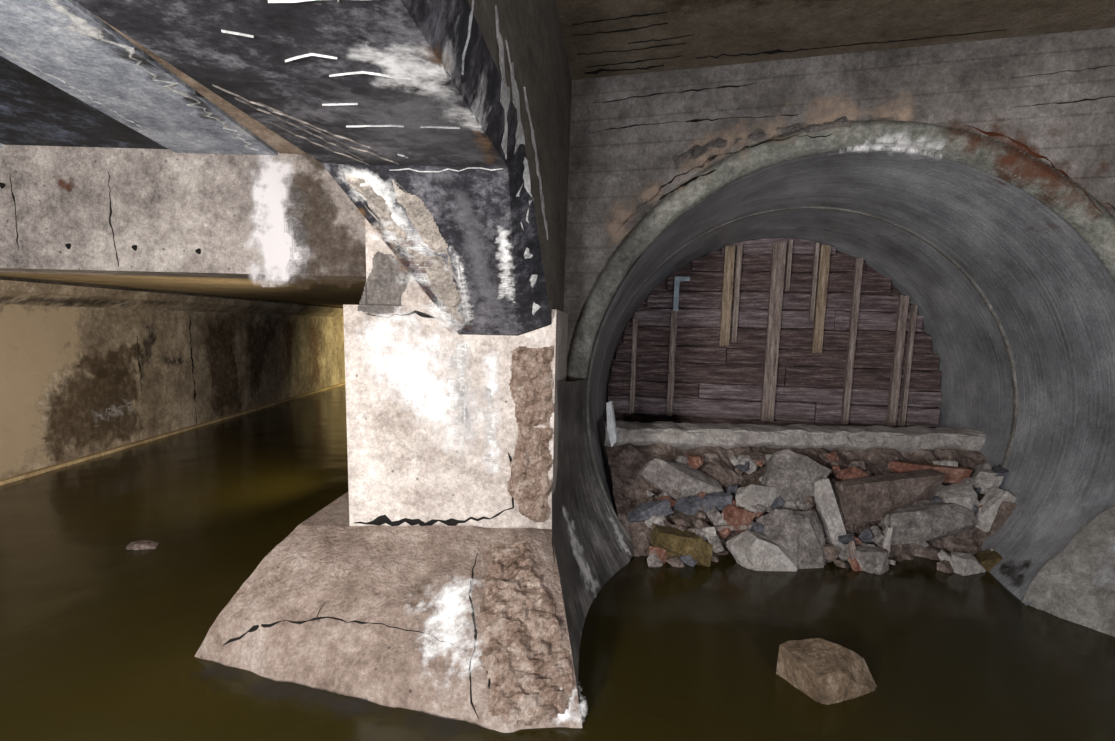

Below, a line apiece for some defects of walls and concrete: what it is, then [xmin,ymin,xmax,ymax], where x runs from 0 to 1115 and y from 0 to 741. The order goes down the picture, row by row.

leakage [0,48,153,134]
peeling [213,84,399,165]
corrosion [955,126,1103,213]
leakage [42,0,548,472]
peeling [340,173,471,330]
crack [354,497,514,526]
crack [223,553,494,719]
leakage [419,579,478,670]